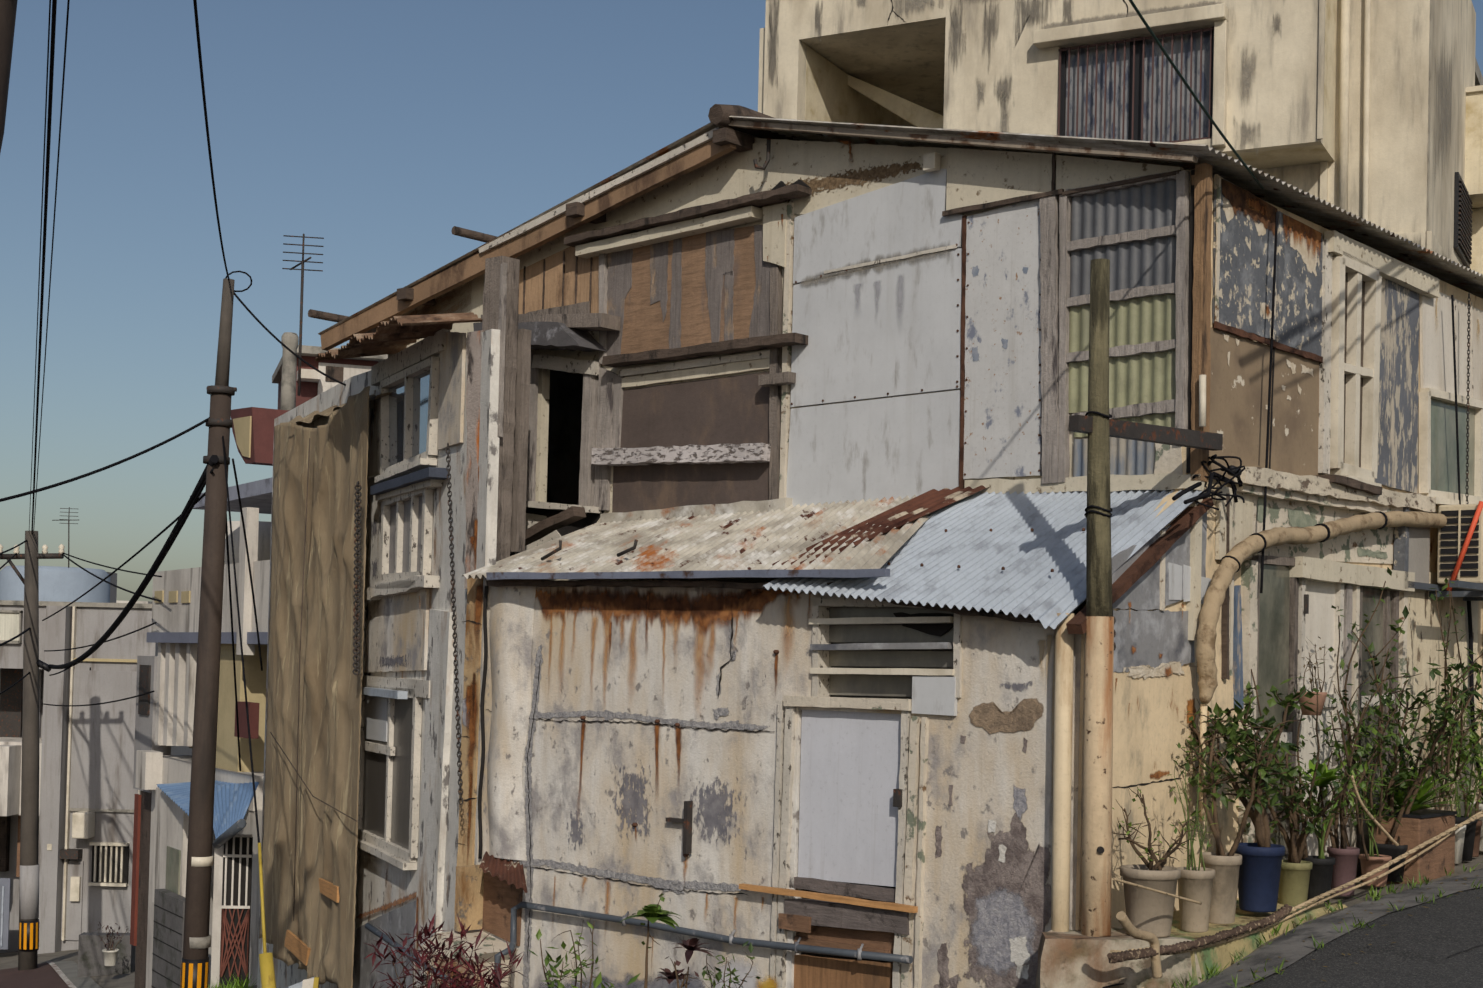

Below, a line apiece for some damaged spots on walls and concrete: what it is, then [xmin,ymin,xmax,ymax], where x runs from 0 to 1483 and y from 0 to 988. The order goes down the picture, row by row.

water stain [769,2,779,83]
water stain [949,11,962,63]
water stain [983,0,996,52]
water stain [1017,0,1216,39]
water stain [977,79,1011,132]
peeling [1223,197,1234,222]
peeling [1255,222,1266,236]
peeling [1290,232,1318,277]
corrosion [772,485,989,570]
corrosion [535,588,820,683]
flaking render [960,681,1044,753]
peeling [934,786,1051,988]